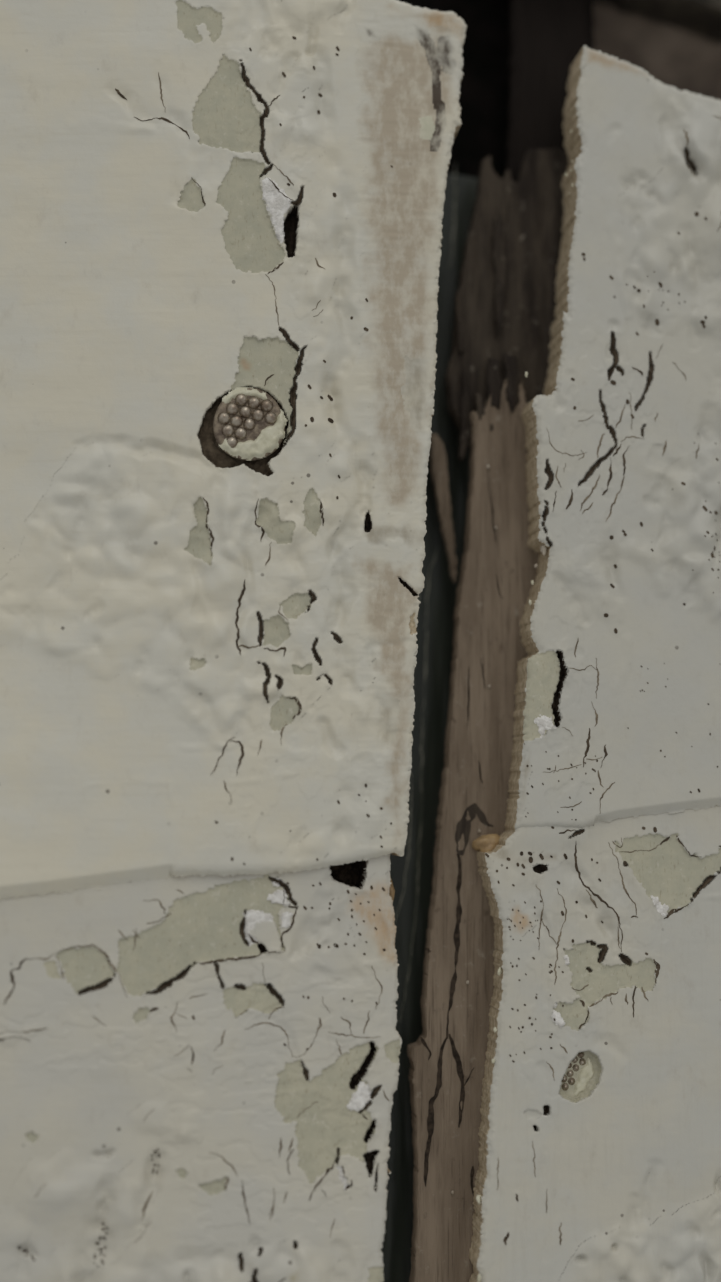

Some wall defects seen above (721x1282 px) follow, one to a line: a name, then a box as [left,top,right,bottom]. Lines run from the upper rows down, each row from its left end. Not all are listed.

peeling [175,0,299,273]
peeling [198,337,299,476]
crack [543,332,699,546]
crack [467,662,485,726]
peeling [523,651,567,741]
peeling [56,874,293,1023]
crack [0,877,383,1282]
peeling [274,1039,401,1192]
spalling [329,860,367,889]
crack [360,1086,389,1120]
crack [420,854,475,1187]
crack [470,1141,562,1245]